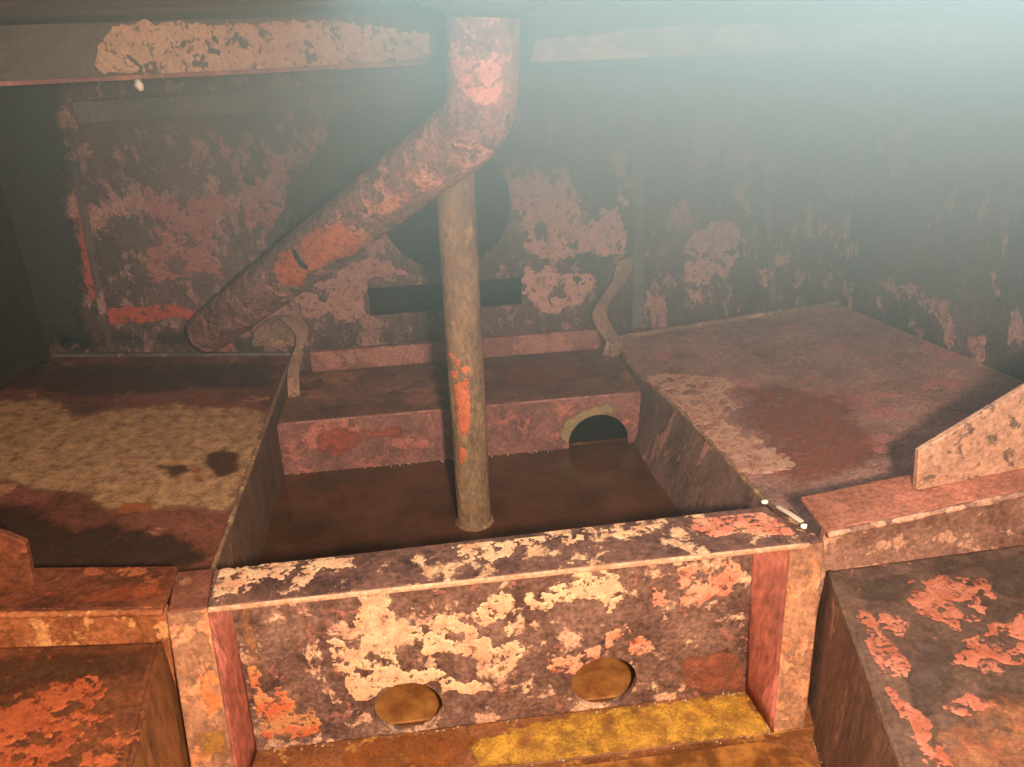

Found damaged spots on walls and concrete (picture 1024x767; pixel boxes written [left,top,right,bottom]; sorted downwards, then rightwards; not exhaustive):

peeling [94,18,431,91]
peeling [512,167,629,314]
damp [1,364,269,395]
damp [0,506,204,568]
peeling [326,570,625,701]
peeling [546,624,652,675]
rust [469,652,771,766]
rust [907,638,953,712]
rust [939,701,1024,767]